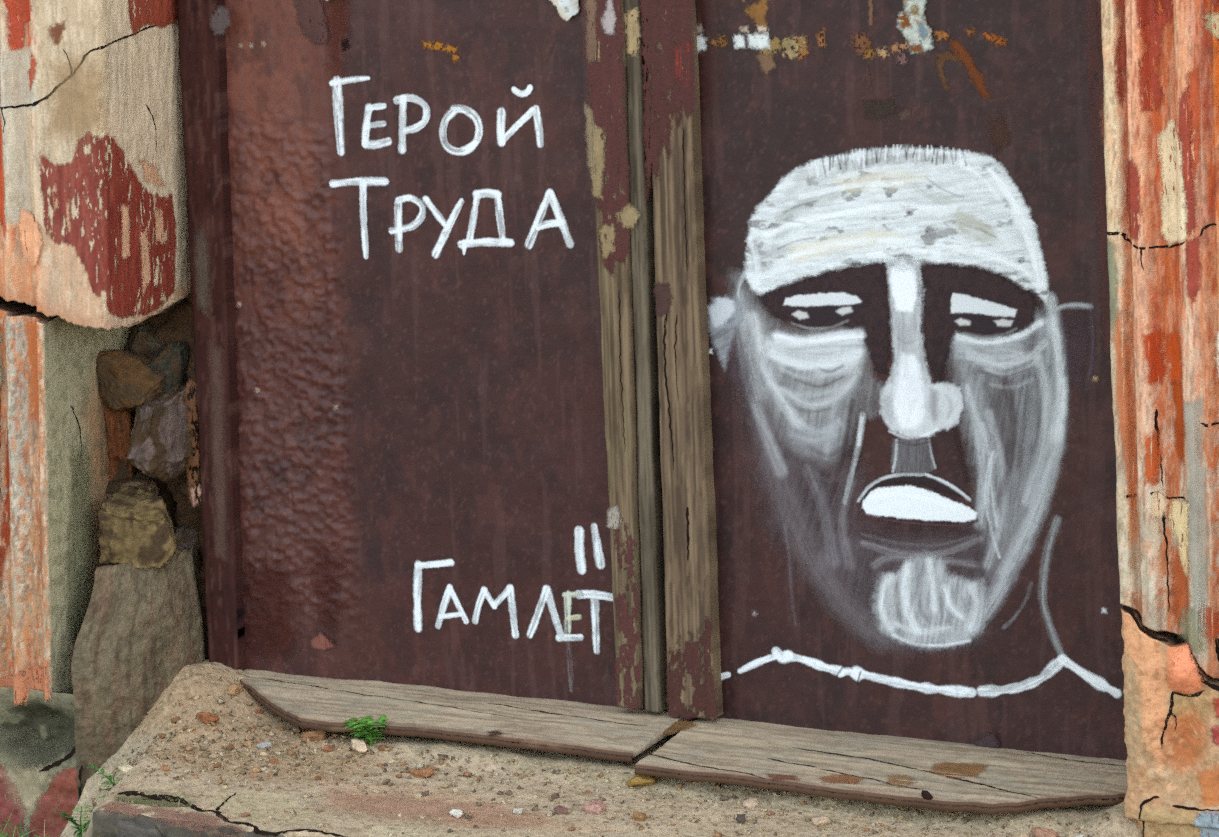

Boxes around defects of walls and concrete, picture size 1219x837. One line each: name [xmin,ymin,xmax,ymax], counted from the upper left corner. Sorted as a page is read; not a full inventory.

peeling [3,0,37,90]
crack [0,17,174,131]
peeling [0,114,176,318]
peeling [1083,0,1173,351]
crack [1107,223,1217,270]
flaking render [1157,0,1219,301]
flaking render [1152,491,1188,577]
crack [1122,409,1219,748]
spalling [1166,645,1202,694]
flaking render [0,765,79,837]
crack [118,791,347,837]
crack [1138,796,1219,837]